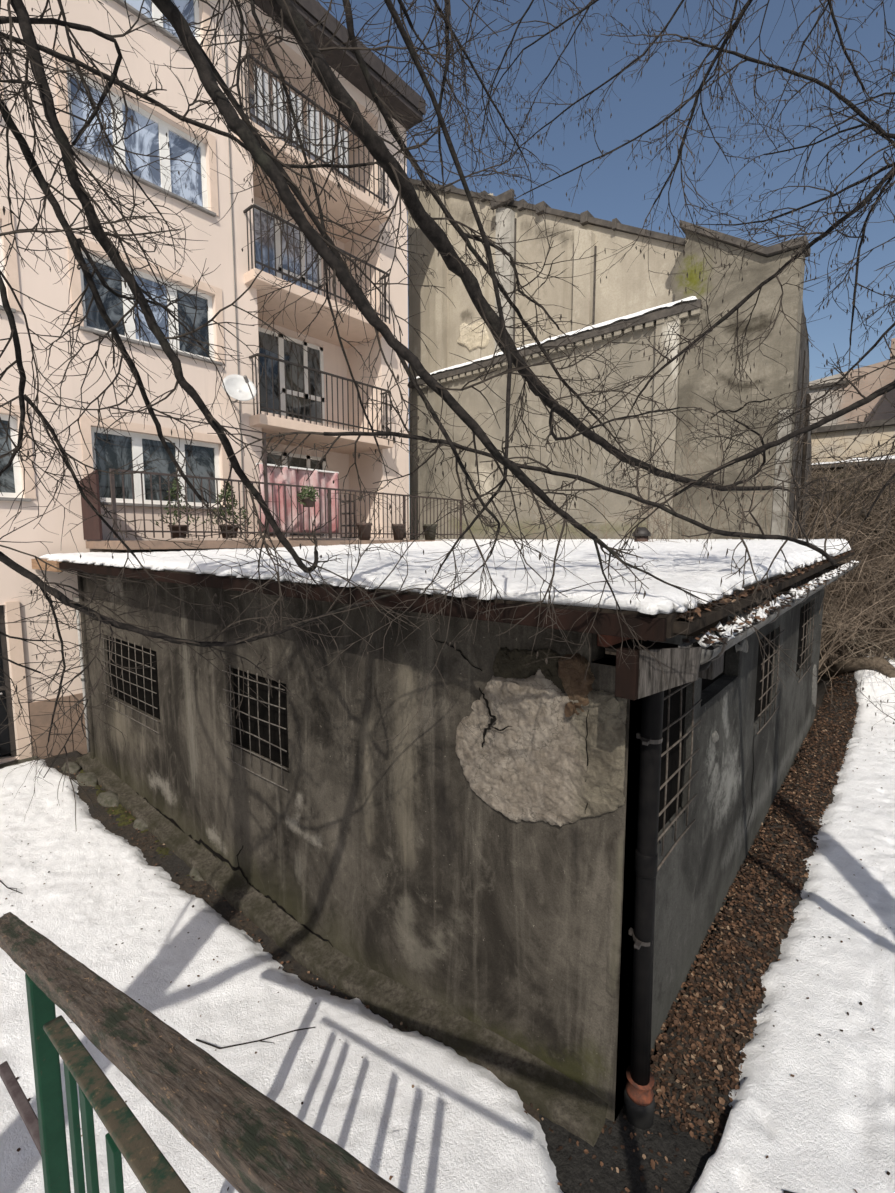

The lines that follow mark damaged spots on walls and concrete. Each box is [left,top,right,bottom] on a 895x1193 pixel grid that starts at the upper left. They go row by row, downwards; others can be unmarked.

spalling [456,647,627,826]